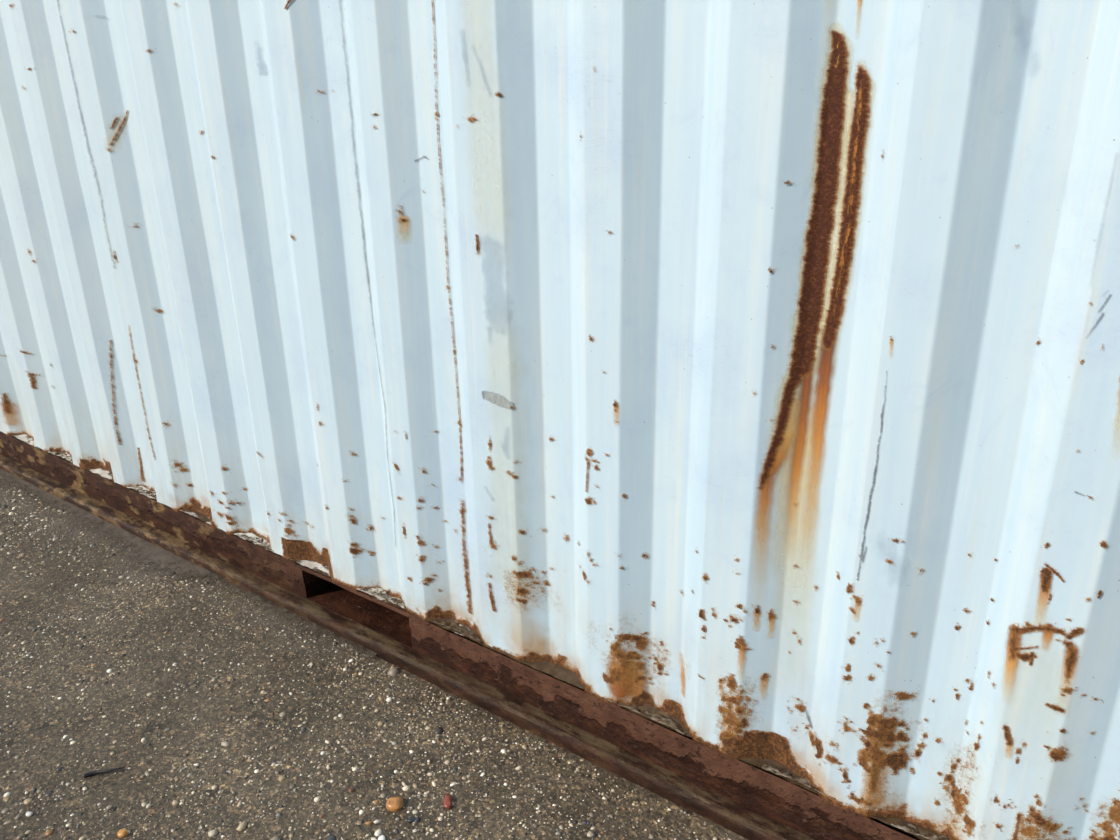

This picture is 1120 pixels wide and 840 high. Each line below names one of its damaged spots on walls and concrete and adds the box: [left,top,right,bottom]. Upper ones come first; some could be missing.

rust [757,24,871,546]
rust [2,393,34,439]
rust [44,447,157,501]
rust [584,449,608,505]
rust [173,460,1075,840]
rust [987,619,1102,712]
rust [1076,790,1120,840]